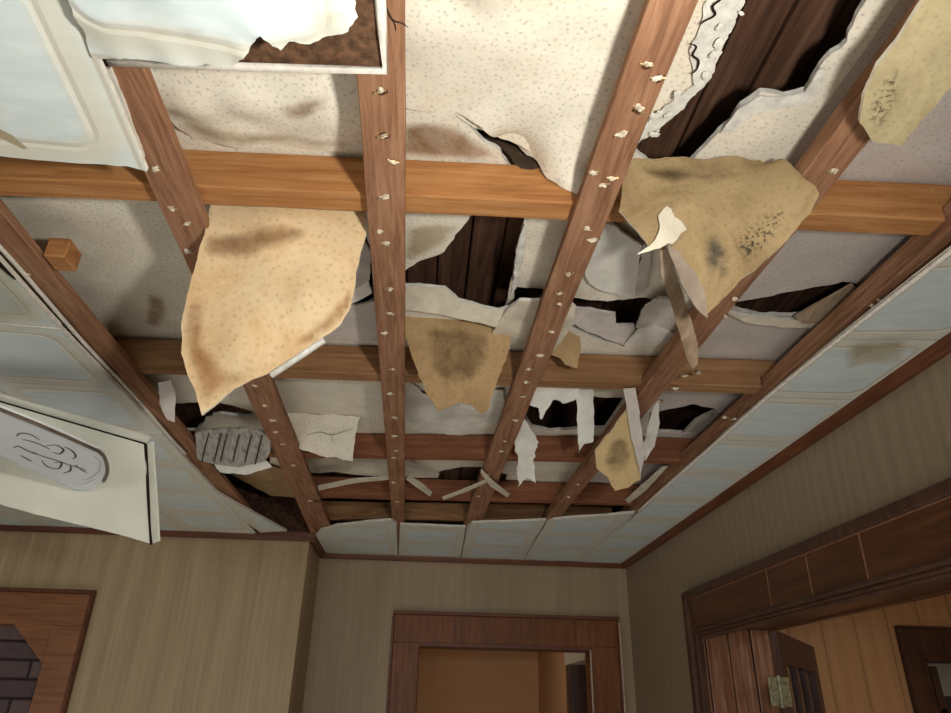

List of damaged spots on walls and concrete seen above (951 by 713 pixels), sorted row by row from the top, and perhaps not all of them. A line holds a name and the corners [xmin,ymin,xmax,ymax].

peeling [68,0,358,68]
flaking render [639,0,745,142]
crack [690,0,721,74]
flaking render [720,67,826,134]
flaking render [511,218,528,294]
damp [710,244,723,264]
damp [740,217,780,255]